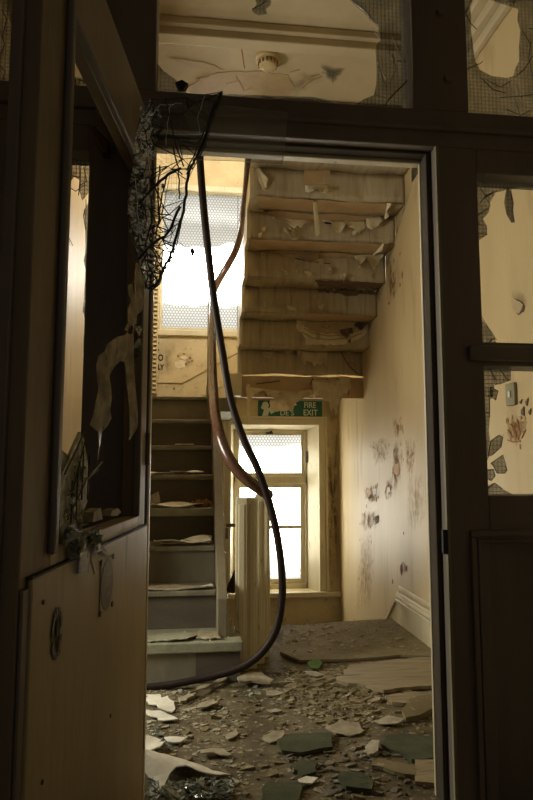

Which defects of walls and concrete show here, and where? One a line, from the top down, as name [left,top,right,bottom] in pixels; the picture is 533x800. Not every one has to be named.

peeling [170,58,294,99]
peeling [251,167,392,296]
peeling [296,313,374,346]
peeling [246,376,351,414]